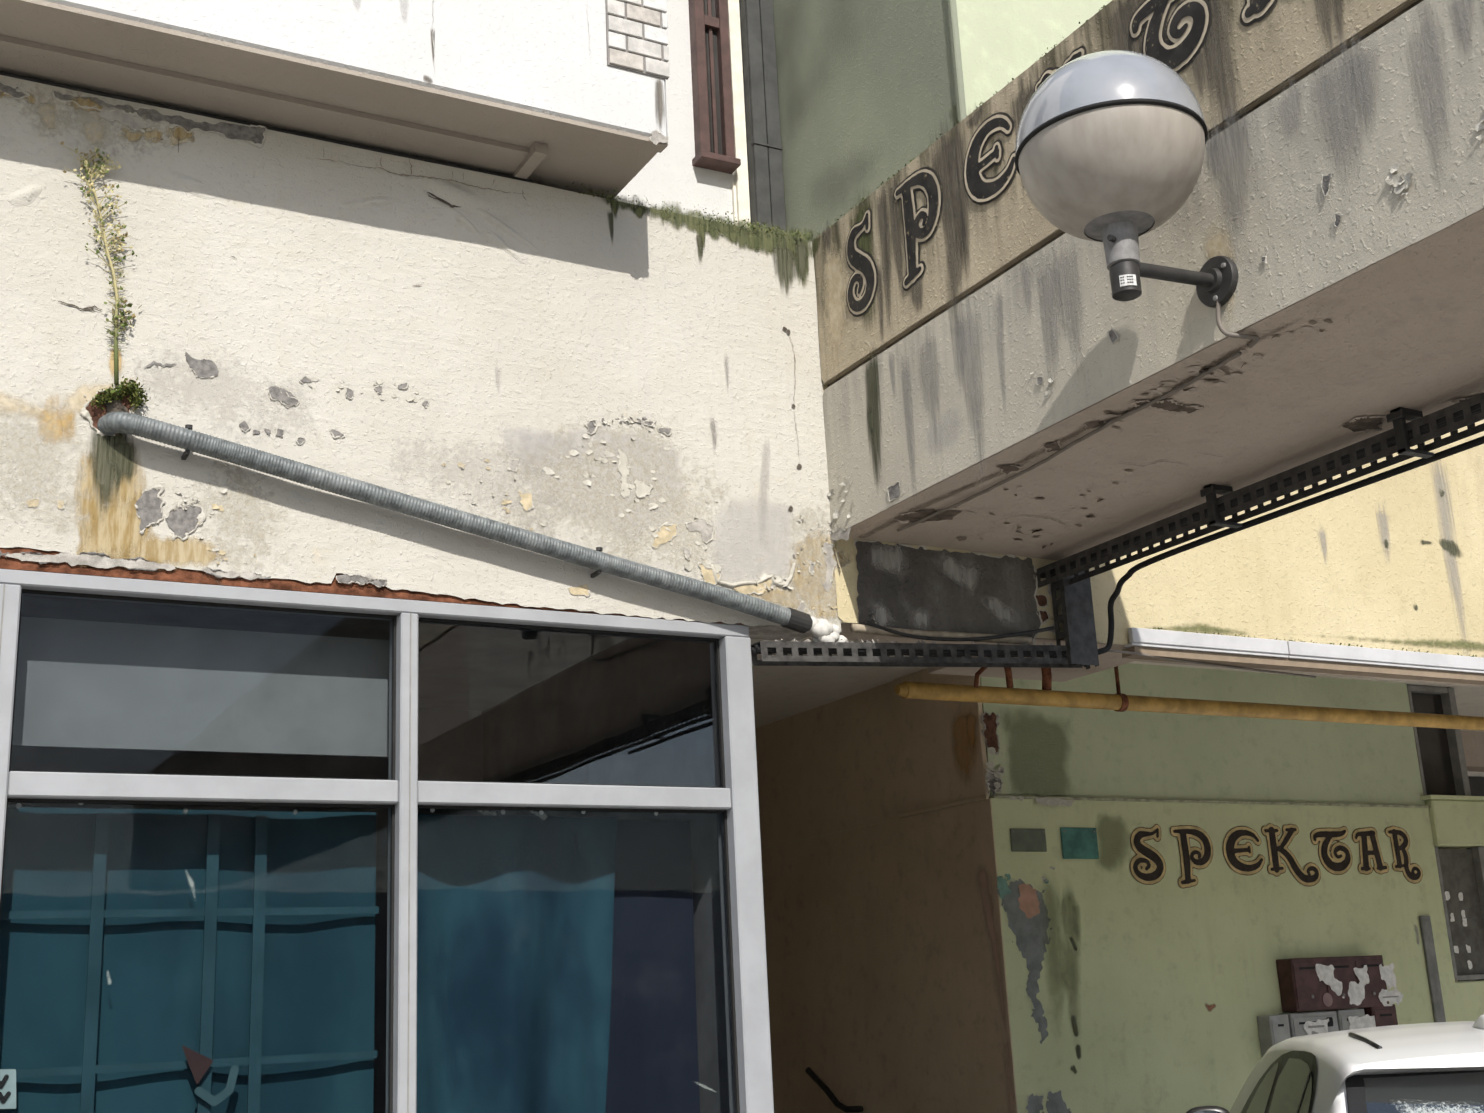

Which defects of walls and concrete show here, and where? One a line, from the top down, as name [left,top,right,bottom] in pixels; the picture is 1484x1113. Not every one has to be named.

leakage [1111,0,1143,54]
leakage [932,110,980,311]
leakage [697,223,831,291]
leakage [851,181,922,336]
peeling [185,351,219,378]
leakage [92,432,134,506]
spalling [0,551,175,571]
peeling [134,485,271,580]
spalling [336,574,387,588]
peeling [543,415,1062,644]
leakage [1421,540,1461,556]
peeling [996,866,1055,1044]